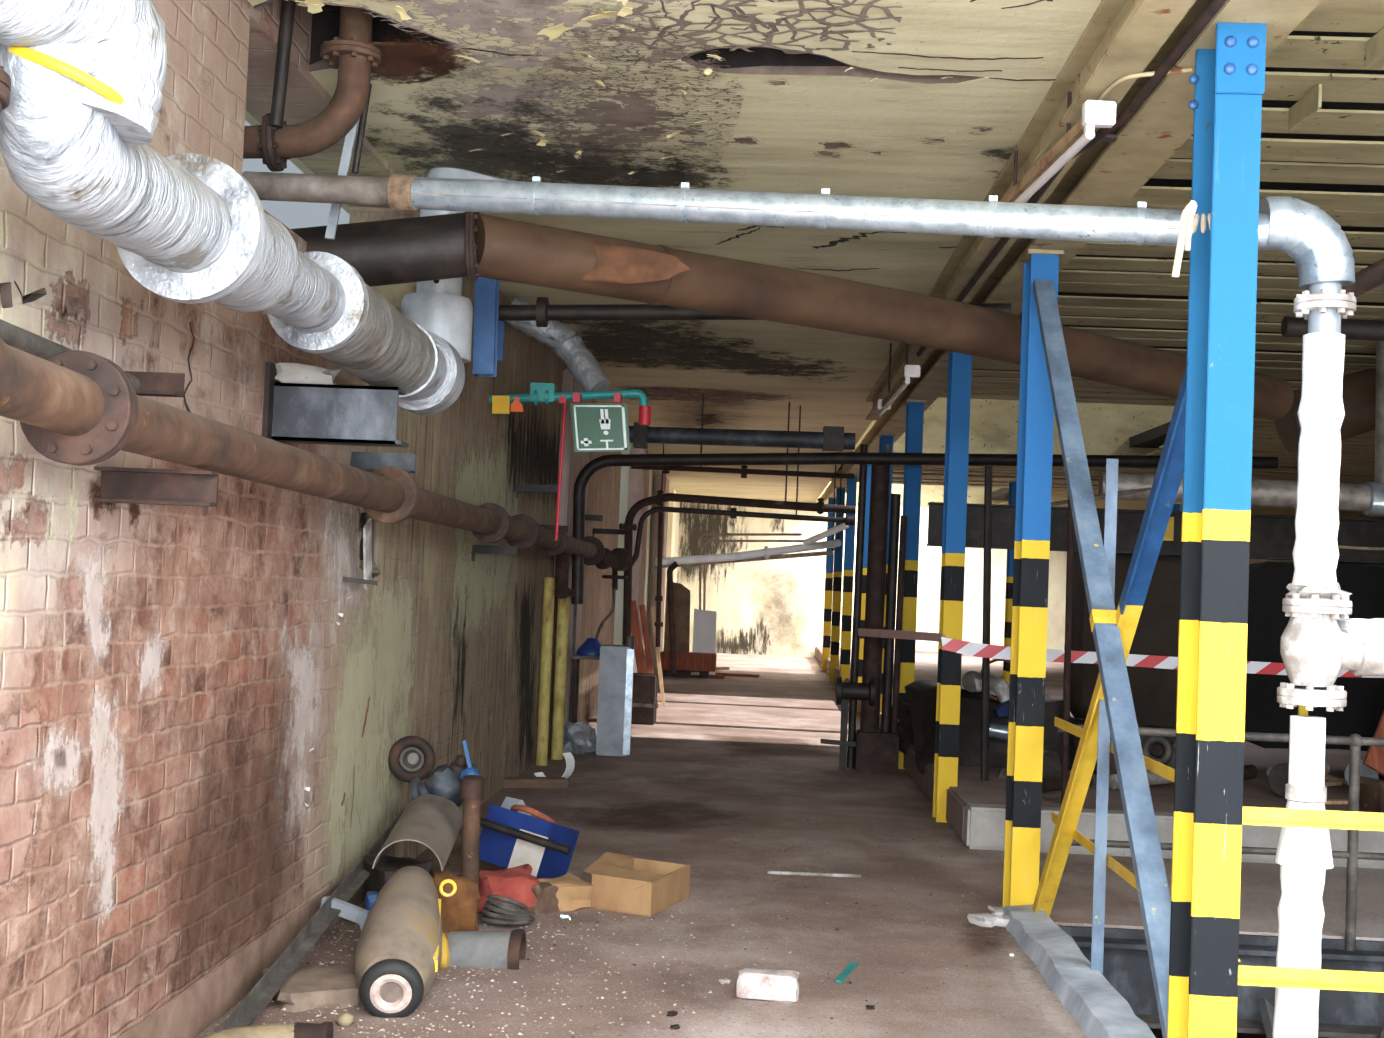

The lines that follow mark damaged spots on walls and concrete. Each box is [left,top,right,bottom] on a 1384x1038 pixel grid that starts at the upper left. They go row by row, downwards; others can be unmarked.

peeling [254,0,758,182]
water stain [366,97,728,189]
crack [615,0,1055,84]
spalling [814,142,886,158]
peeling [0,271,90,350]
water stain [559,320,851,425]
peeling [0,453,48,548]
water stain [506,402,560,515]
efflorescence [80,548,110,661]
efflorescence [138,632,164,692]
peeling [0,700,45,889]
efflorescence [34,692,123,922]